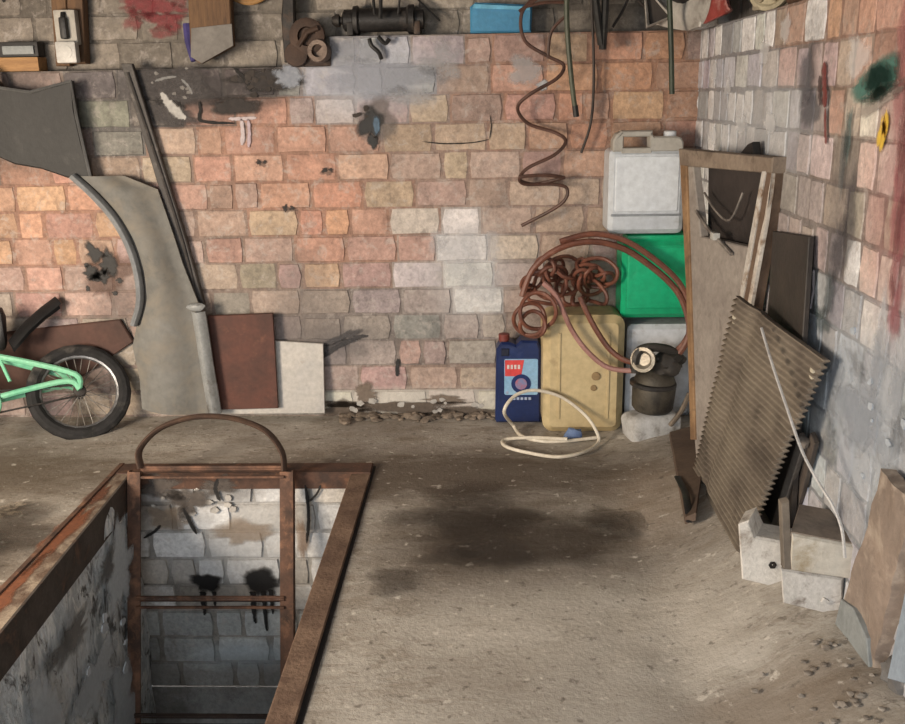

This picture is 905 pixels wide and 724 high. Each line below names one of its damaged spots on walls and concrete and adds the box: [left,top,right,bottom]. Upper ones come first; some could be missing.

corrosion [0,484,111,610]
corrosion [218,522,269,543]